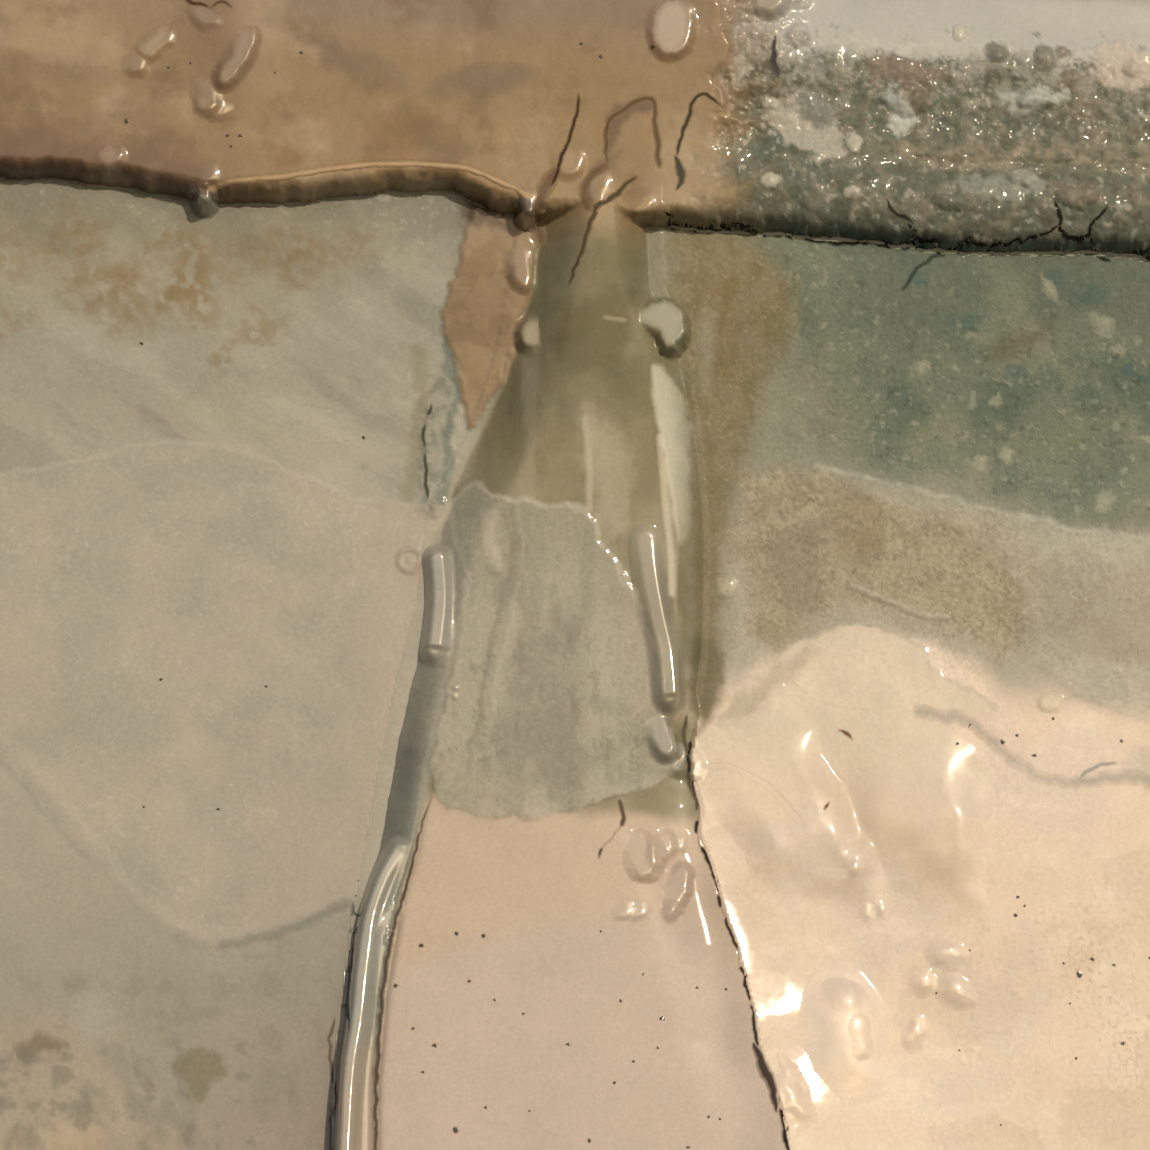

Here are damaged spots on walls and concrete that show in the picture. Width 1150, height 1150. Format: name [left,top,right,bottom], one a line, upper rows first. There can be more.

crack [527,90,1150,291]
water stain [501,349,522,421]
crack [420,403,433,499]
crack [837,728,854,741]
crack [680,714,793,1150]
water stain [0,911,353,1150]
water stain [370,961,398,1047]
water stain [362,1079,386,1138]